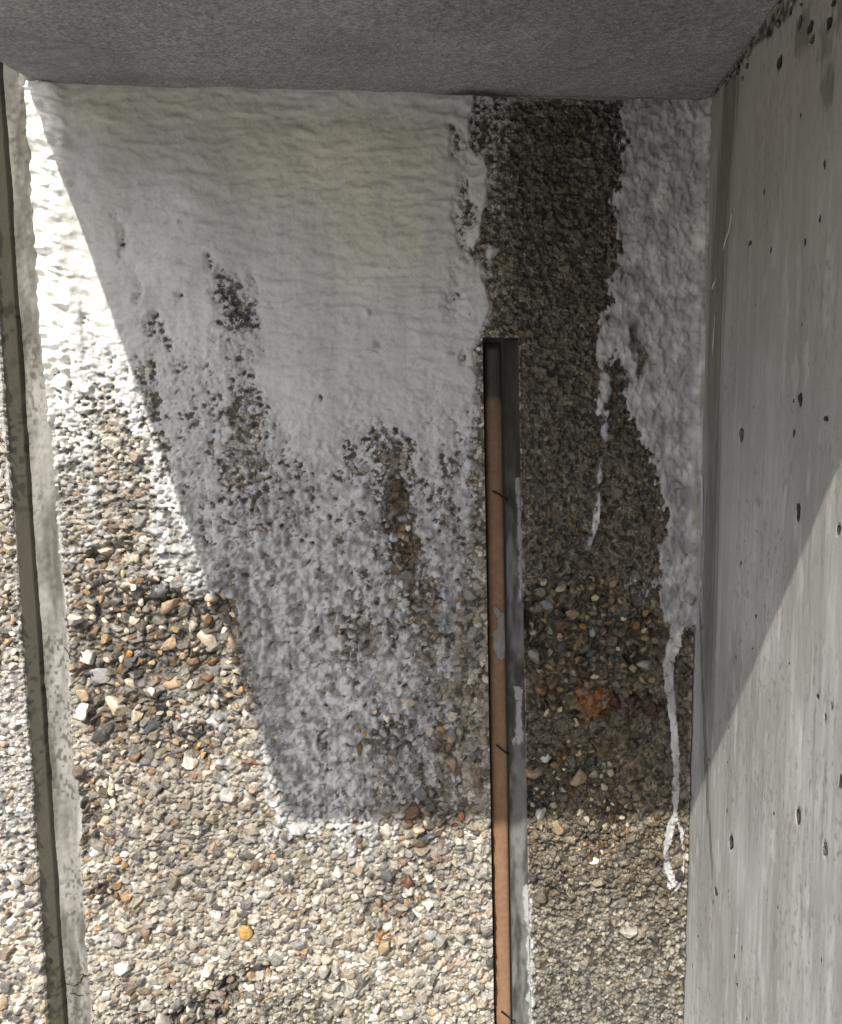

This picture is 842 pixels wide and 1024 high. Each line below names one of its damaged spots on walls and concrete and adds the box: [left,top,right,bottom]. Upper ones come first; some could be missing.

leakage [23,73,735,1024]